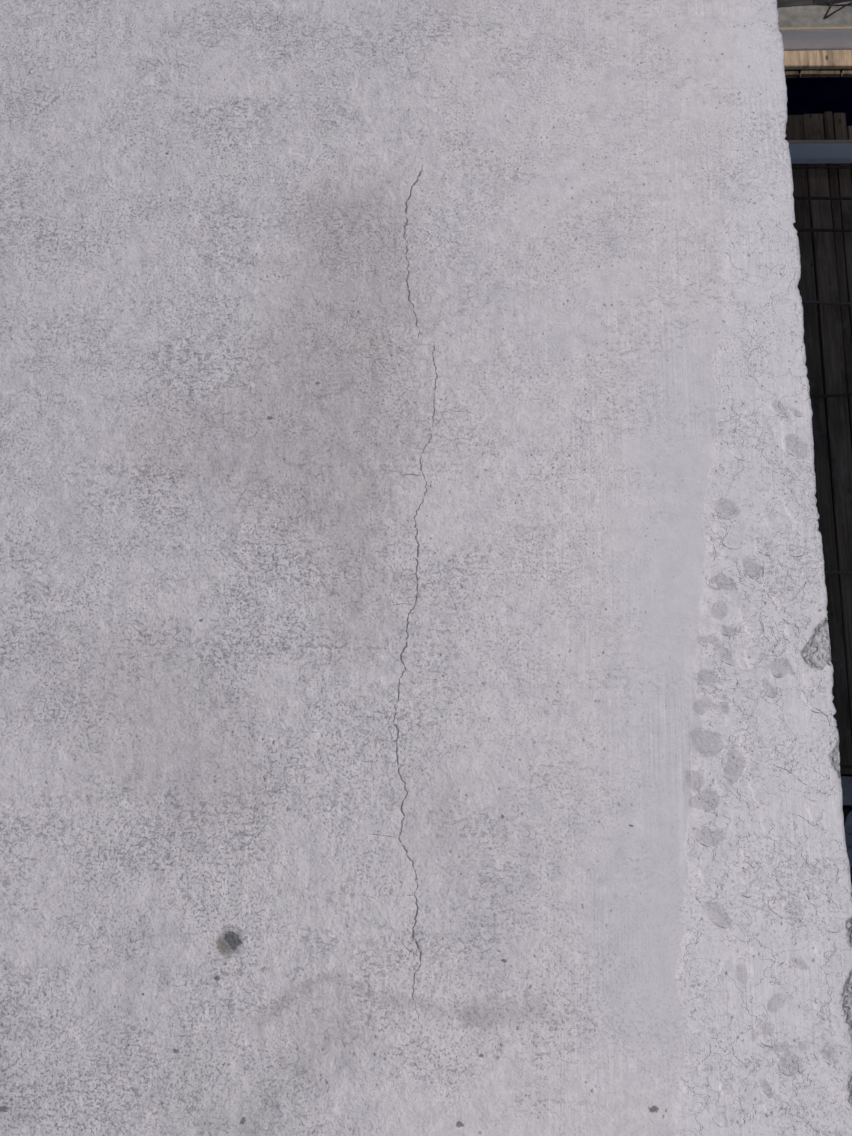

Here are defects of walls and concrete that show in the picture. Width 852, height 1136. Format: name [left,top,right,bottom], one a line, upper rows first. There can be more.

crack [393,172,437,1017]